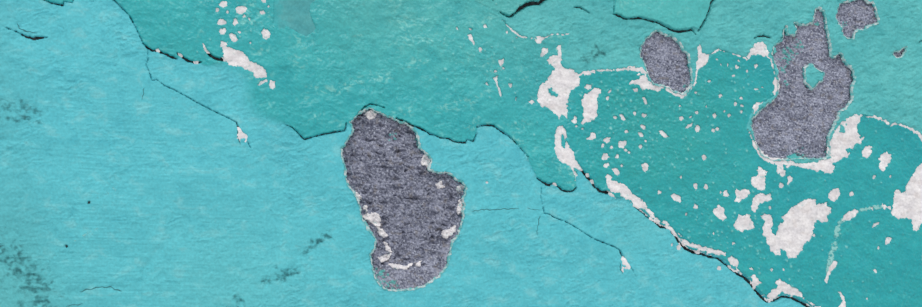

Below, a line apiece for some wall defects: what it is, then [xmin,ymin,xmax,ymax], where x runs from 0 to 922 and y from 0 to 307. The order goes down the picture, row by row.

crack [15,24,44,40]
crack [144,44,223,63]
peeling [216,1,275,89]
peeling [260,0,316,40]
crack [502,0,545,18]
crack [613,0,713,33]
peeling [485,58,517,100]
spalling [506,0,922,307]
spalling [341,107,467,292]